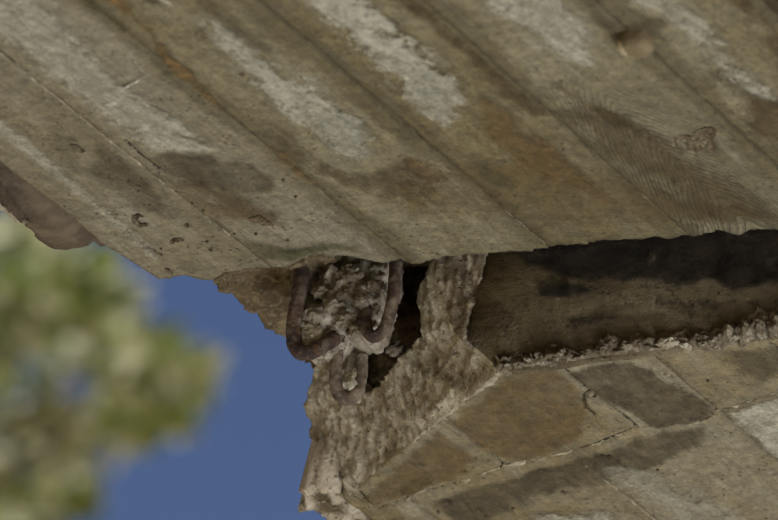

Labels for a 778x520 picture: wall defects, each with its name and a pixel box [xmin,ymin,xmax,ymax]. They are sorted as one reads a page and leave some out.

water stain [714,55,778,142]
water stain [513,107,778,297]
spalling [213,253,778,498]
water stain [435,364,712,520]